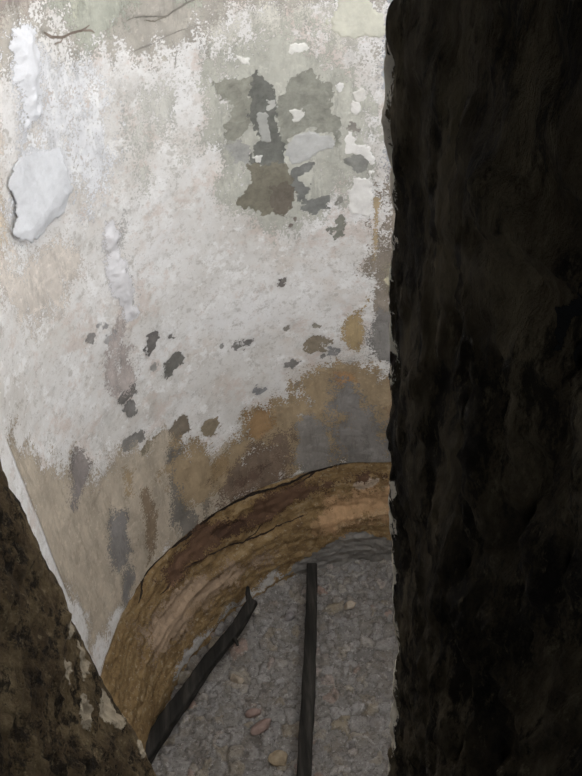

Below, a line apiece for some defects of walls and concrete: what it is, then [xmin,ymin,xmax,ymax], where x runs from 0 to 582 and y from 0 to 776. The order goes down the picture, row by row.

crack [44,25,95,45]
crack [128,0,215,66]
peeling [288,43,310,55]
peeling [7,131,73,243]
spalling [212,56,375,240]
damp [6,408,241,658]